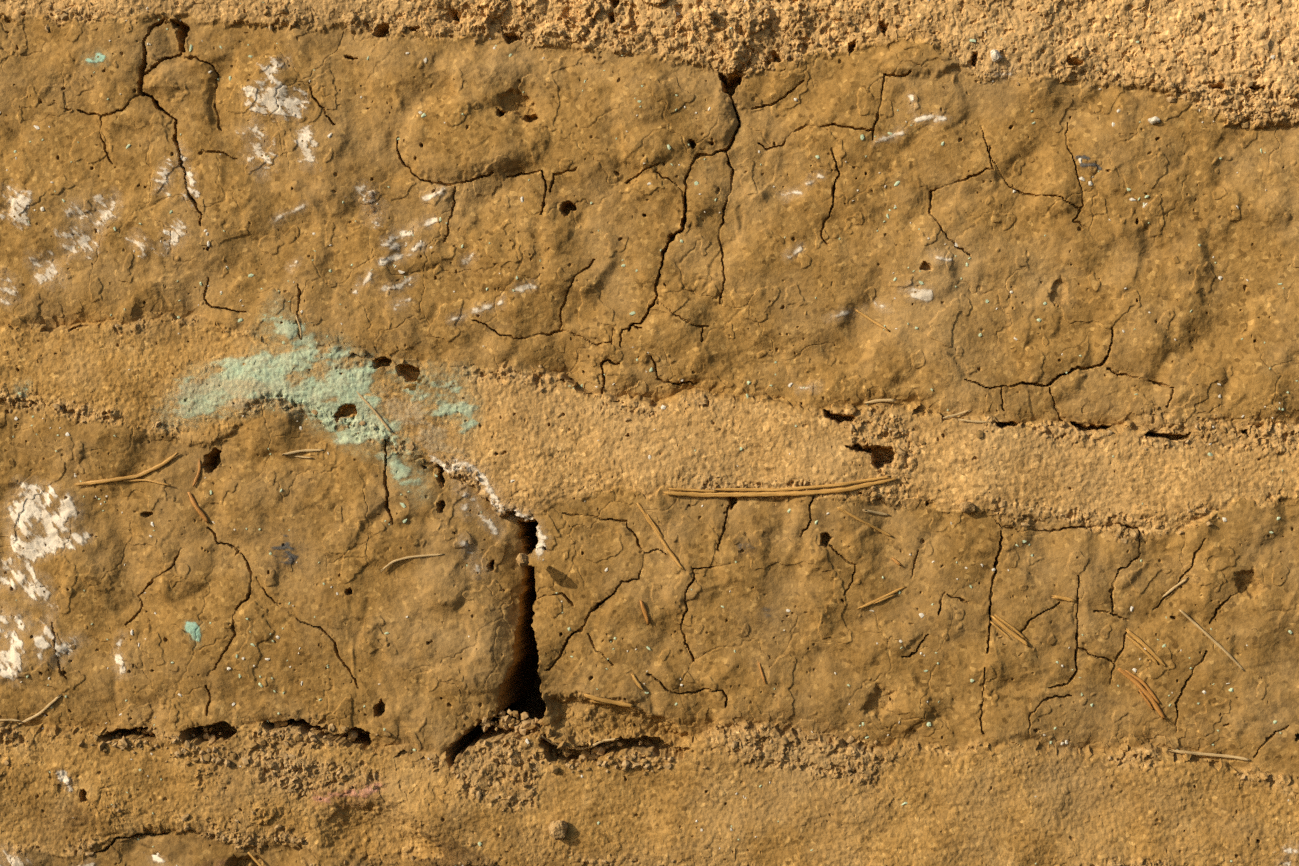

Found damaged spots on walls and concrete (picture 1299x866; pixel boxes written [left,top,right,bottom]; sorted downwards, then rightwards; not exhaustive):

crack [76,18,238,227]
crack [203,277,247,314]
crack [295,283,303,340]
crack [310,89,336,125]
crack [396,138,579,243]
crack [471,69,912,399]
crack [928,122,1088,256]
crack [964,327,1175,422]
crack [124,527,359,716]
crack [536,505,733,708]